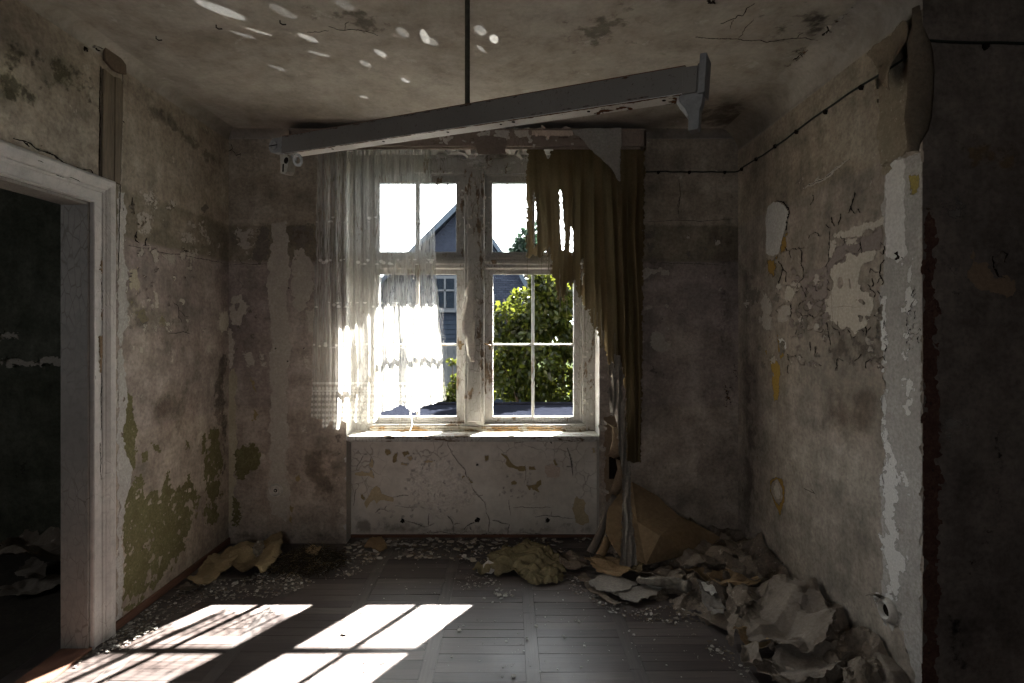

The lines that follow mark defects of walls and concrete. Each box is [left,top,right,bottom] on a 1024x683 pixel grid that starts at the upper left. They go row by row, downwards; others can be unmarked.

crack [699,3,832,61]
flaking render [74,190,591,668]
crack [375,442,574,534]
flaking render [744,150,924,683]